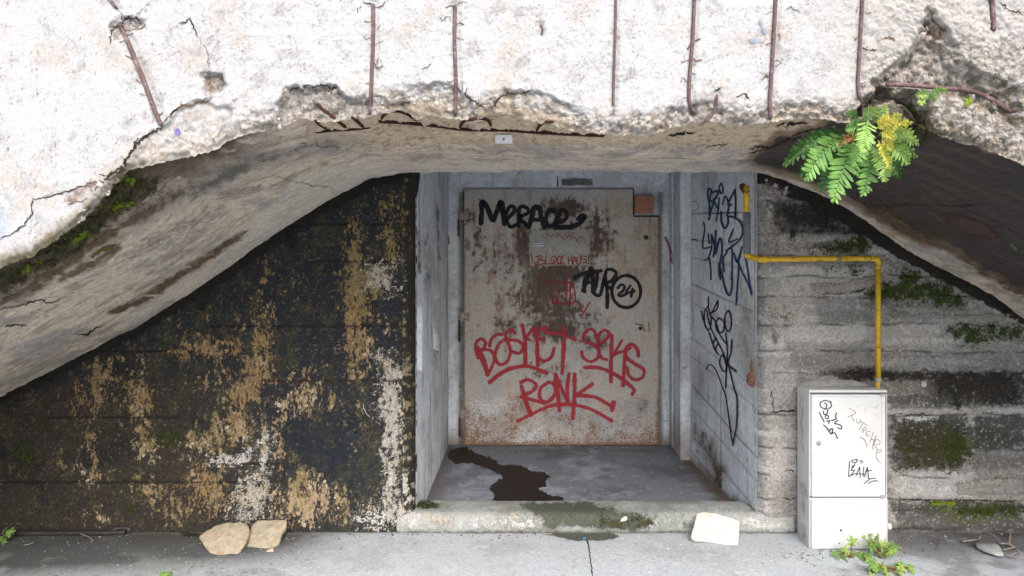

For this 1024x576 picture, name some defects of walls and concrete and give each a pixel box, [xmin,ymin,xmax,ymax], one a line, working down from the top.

crack [1,1,212,238]
spalling [114,22,163,126]
spalling [277,3,605,137]
spalling [667,0,778,129]
spalling [856,0,865,116]
spalling [989,0,997,31]
water stain [0,154,414,403]
water stain [353,206,441,301]
water stain [732,173,1024,423]
water stain [205,403,362,527]
water stain [344,351,649,541]
crack [770,391,796,413]